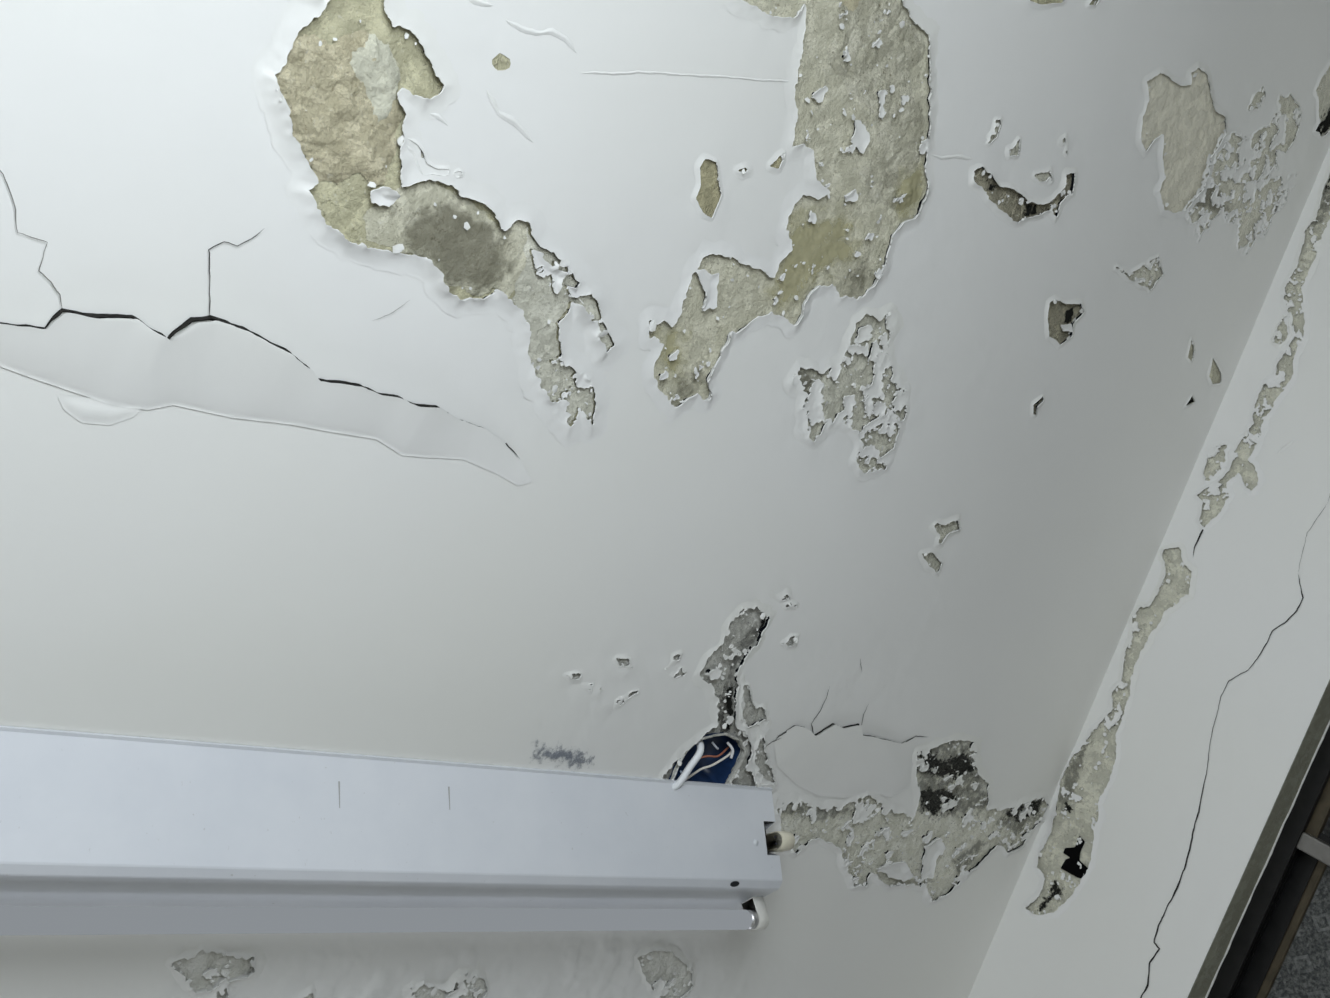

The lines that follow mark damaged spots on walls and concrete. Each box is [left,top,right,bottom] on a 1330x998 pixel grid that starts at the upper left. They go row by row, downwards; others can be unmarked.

crack [0,170,517,455]
peeling [250,0,940,482]
spalling [968,114,1079,228]
spalling [1043,294,1087,350]
peeling [1134,59,1330,257]
peeling [1191,166,1330,534]
crack [767,687,924,746]
peeling [656,542,1198,922]
crack [1140,497,1330,998]
peeling [165,942,269,998]
peeling [399,960,491,998]
peeling [634,942,697,998]